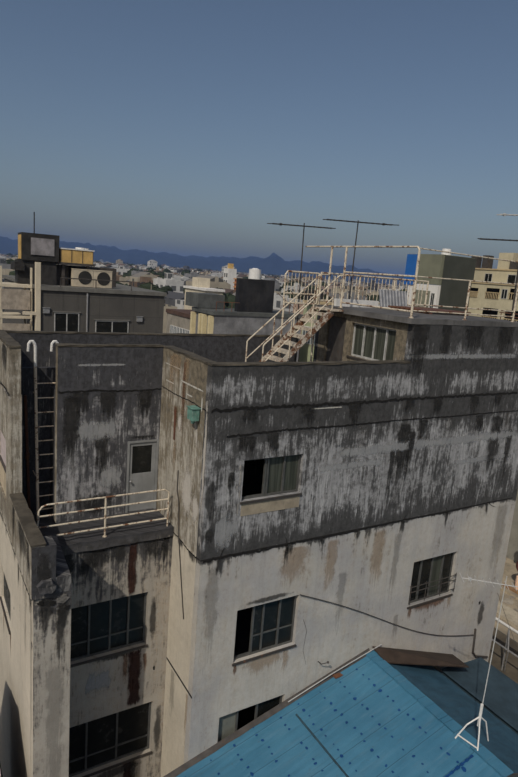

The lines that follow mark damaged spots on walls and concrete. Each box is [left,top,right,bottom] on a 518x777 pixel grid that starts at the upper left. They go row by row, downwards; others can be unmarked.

leakage [406,324,515,378]
crack [59,386,518,452]
leakage [63,397,122,512]
leakage [320,416,513,498]
leakage [206,483,238,548]
corrosion [128,543,137,593]
leakage [40,599,68,659]
corrosion [123,649,146,705]